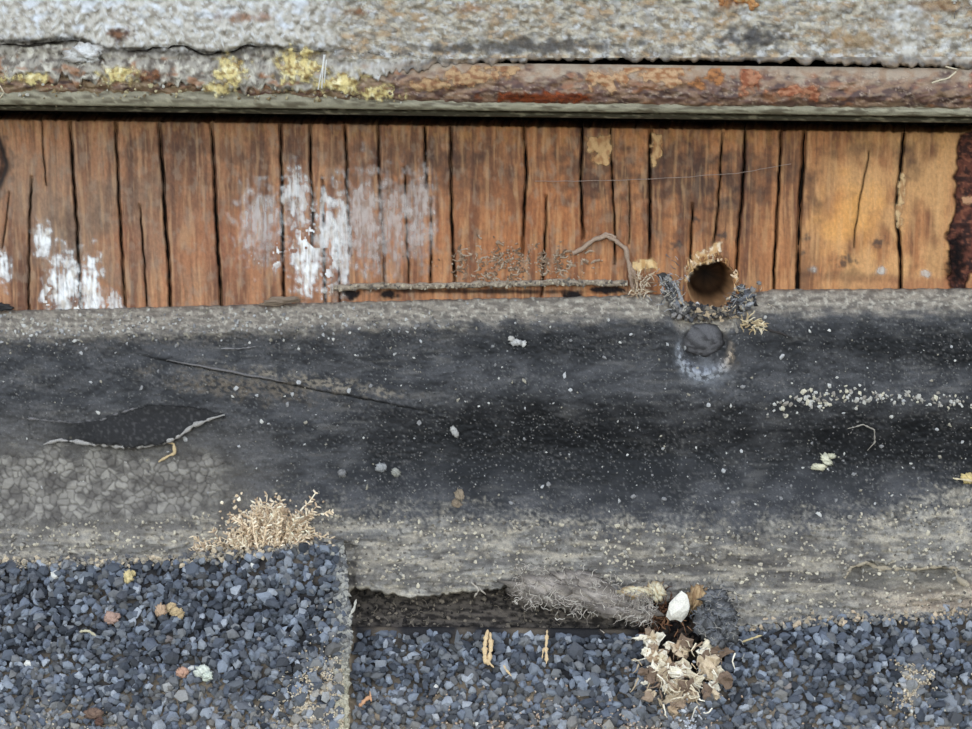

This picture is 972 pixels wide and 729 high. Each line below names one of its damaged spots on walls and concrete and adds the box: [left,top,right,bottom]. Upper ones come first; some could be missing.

corrosion [718,0,760,11]
crack [1,39,87,47]
crack [125,44,427,57]
corrosion [135,69,161,82]
corrosion [687,68,724,90]
corrosion [497,89,589,104]
crack [147,356,422,411]